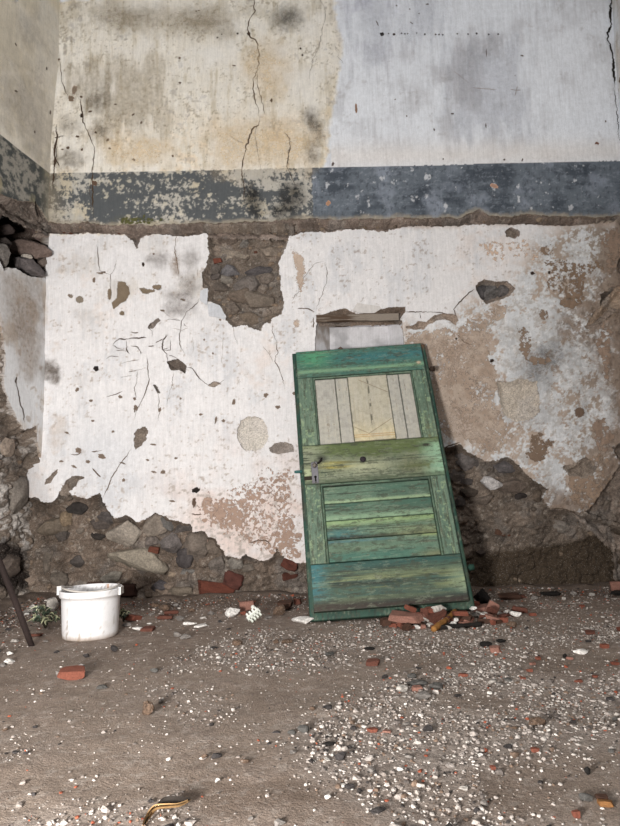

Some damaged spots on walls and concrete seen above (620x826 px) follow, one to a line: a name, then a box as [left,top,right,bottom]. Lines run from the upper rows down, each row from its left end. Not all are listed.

crack [237,1,265,200]
crack [606,0,620,140]
flaking render [0,334,308,600]
crack [106,299,221,417]
flaking render [0,195,620,331]
flaking render [318,280,620,587]